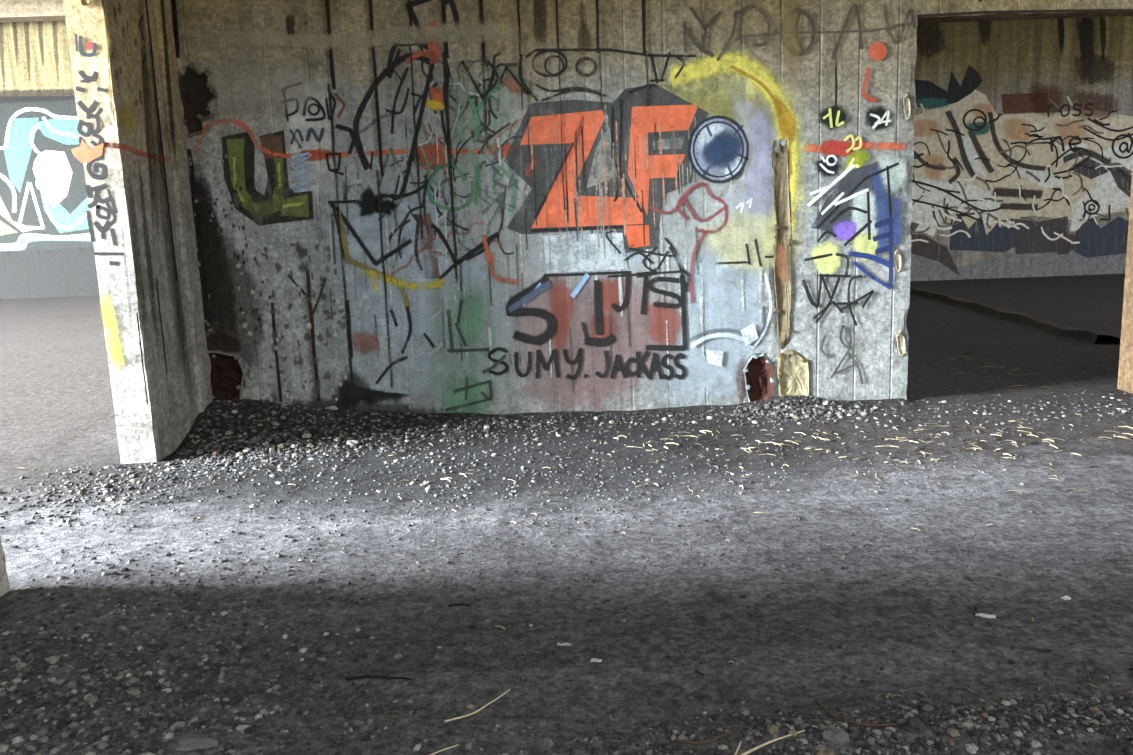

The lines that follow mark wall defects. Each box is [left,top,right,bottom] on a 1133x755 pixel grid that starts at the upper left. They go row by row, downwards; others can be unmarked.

water stain [150,0,262,371]
peeling [208,240,348,405]
spalling [689,142,810,402]